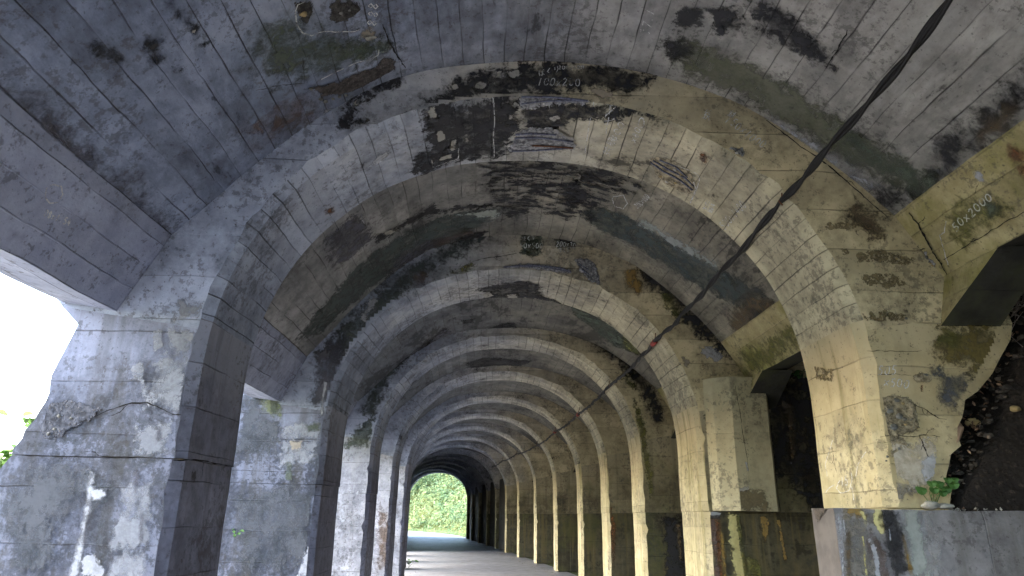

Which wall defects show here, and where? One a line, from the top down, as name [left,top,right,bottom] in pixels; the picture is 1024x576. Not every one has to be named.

leakage [143,39,165,67]
leakage [663,0,839,72]
leakage [323,77,402,130]
peeling [436,131,468,160]
spalling [507,89,613,153]
leakage [323,161,645,270]
crack [766,120,1024,275]
spalling [41,400,102,440]
crack [94,402,182,417]
spalling [882,394,919,462]
crack [882,406,947,467]
leakage [837,509,940,576]